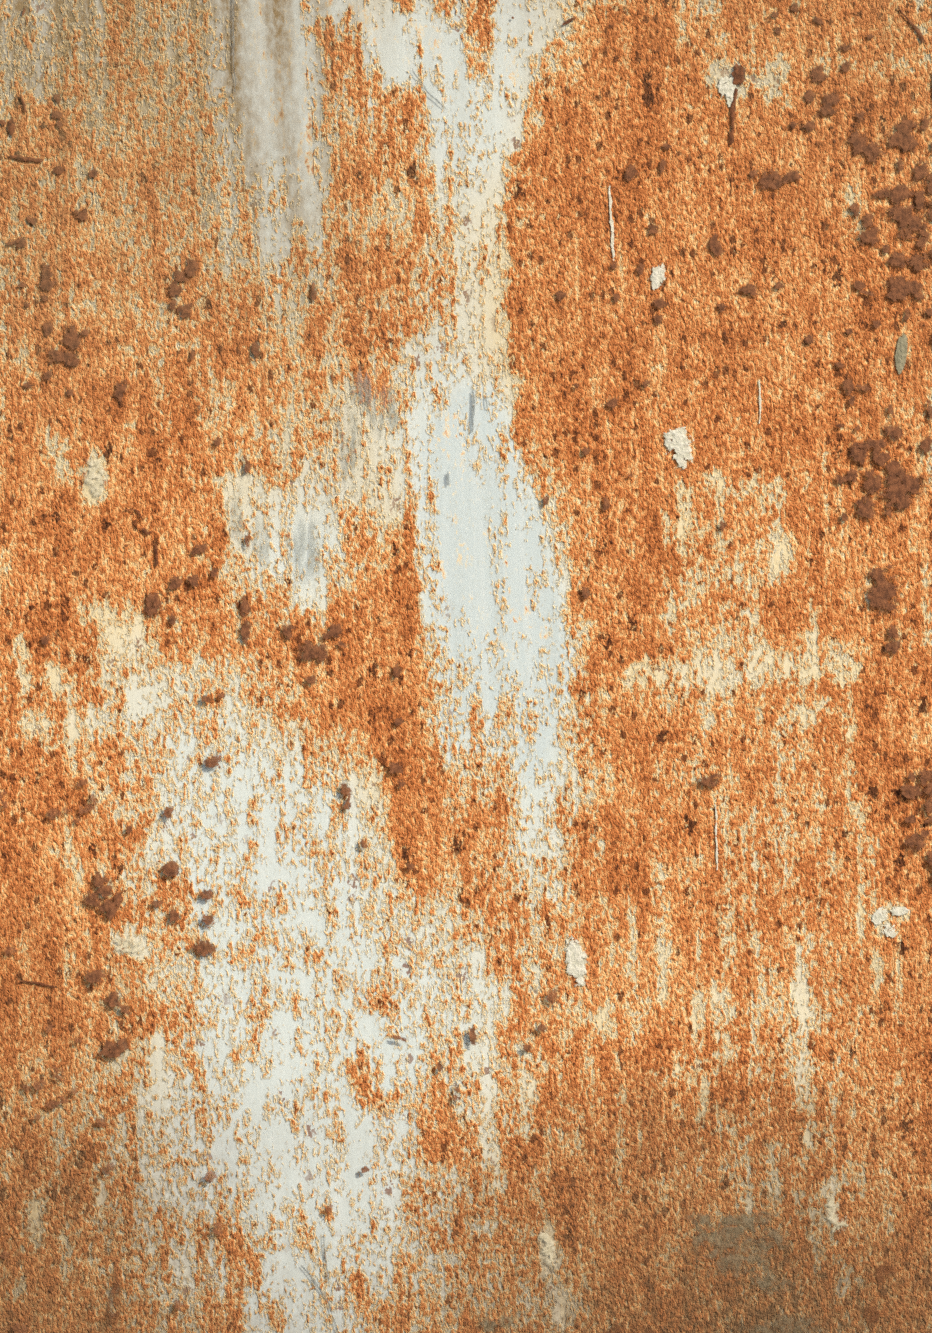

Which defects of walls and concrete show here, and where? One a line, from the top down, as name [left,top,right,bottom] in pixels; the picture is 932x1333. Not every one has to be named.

rust [391,0,418,35]
rust [263,157,301,233]
rust [485,577,509,672]
rust [203,729,246,778]
rust [700,773,721,787]
rust [900,785,922,799]
rust [918,768,932,814]
rust [162,802,187,830]
rust [904,830,930,851]
rust [161,856,180,877]
rust [192,837,357,1236]
rust [769,1173,932,1333]